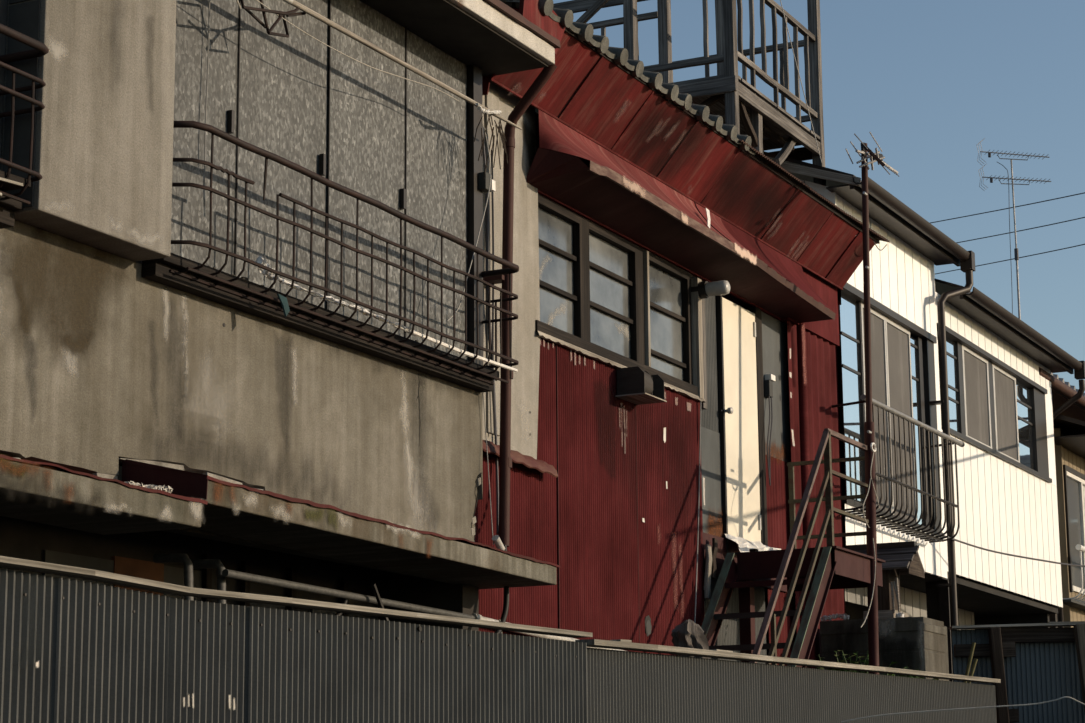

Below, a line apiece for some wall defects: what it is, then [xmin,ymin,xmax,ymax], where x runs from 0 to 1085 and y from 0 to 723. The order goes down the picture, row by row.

water stain [50,42,65,59]
peeling [735,243,756,264]
water stain [9,227,122,371]